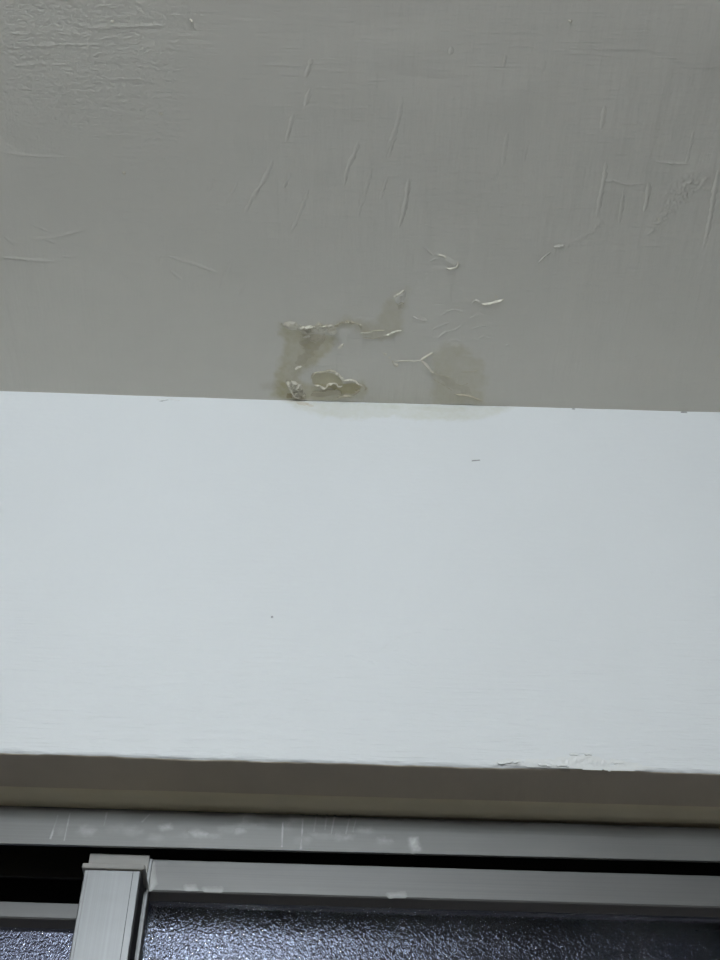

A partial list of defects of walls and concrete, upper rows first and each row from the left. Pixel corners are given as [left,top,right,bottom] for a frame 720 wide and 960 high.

peeling [286,365,368,399]
water stain [258,284,515,423]